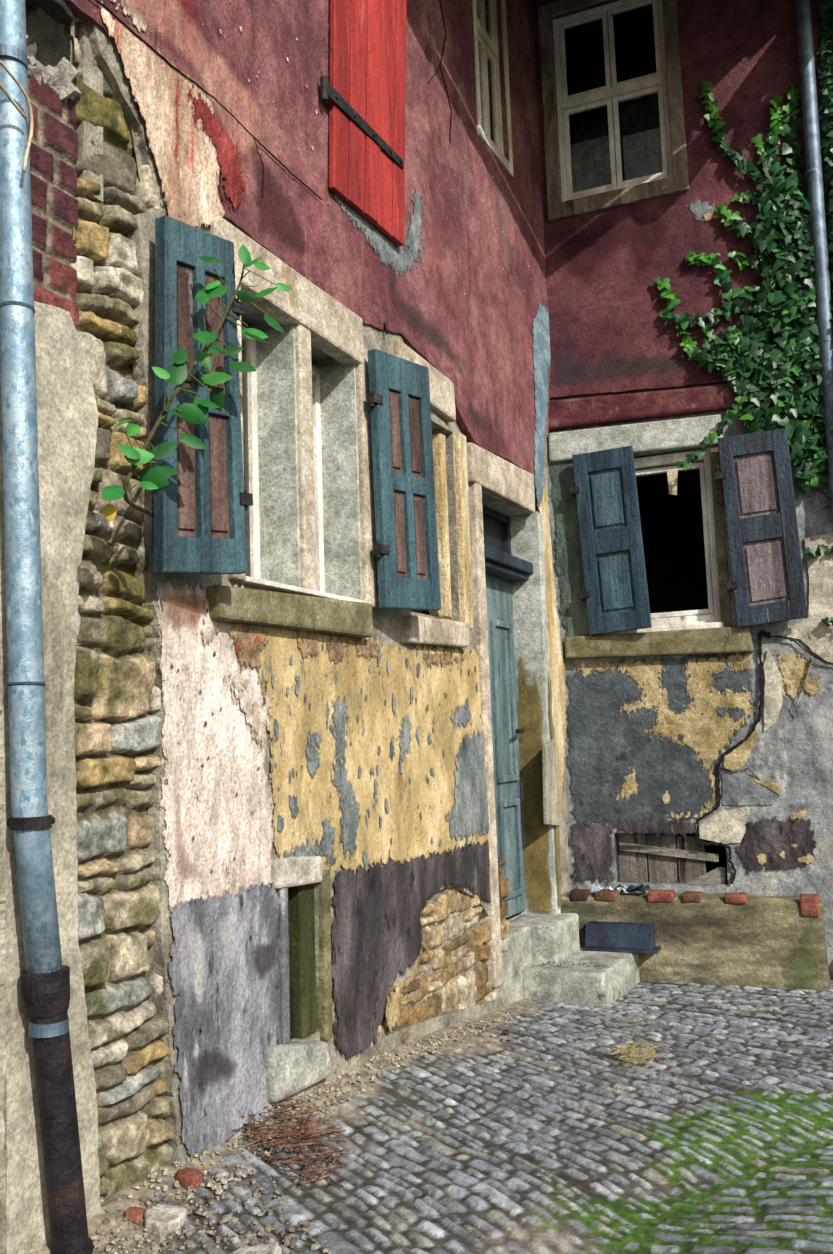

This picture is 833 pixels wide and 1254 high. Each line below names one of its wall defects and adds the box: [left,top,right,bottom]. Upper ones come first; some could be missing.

peeling [98,0,248,229]
spalling [201,596,391,752]
peeling [258,648,489,869]
peeling [532,300,758,885]
crack [695,630,833,884]
peeling [736,810,817,877]